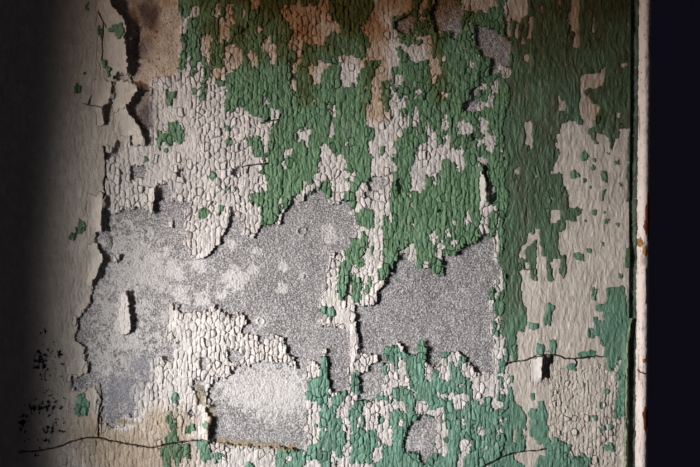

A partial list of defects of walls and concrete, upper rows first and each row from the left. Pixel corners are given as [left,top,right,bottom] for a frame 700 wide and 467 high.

spalling [56,0,386,467]
crack [506,354,604,366]
crack [19,384,206,453]